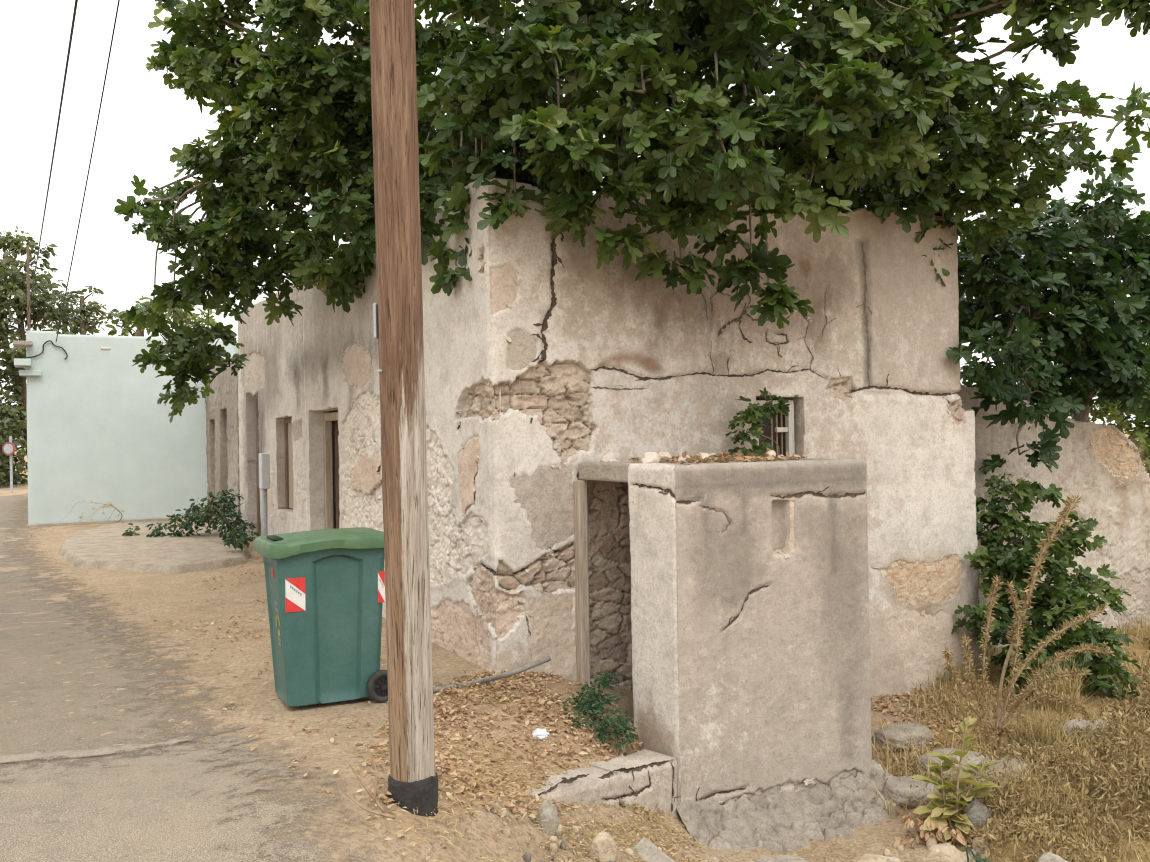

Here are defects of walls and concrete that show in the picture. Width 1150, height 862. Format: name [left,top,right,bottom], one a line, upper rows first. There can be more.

crack [591,244,959,403]
flaking render [342,342,384,532]
flaking render [426,330,633,690]
crack [723,585,769,630]